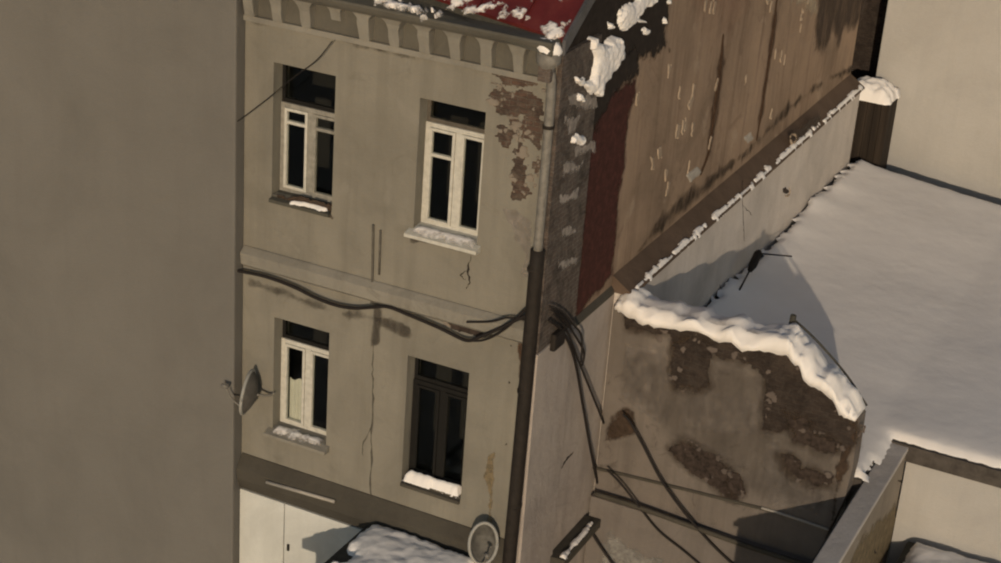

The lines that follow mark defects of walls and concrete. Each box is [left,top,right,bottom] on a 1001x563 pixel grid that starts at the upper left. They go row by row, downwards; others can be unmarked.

water stain [816,0,866,49]
flaking render [485,74,546,201]
crack [362,345,375,495]
flaking render [668,439,746,500]
flaking render [624,315,866,454]
flaking render [780,453,834,493]